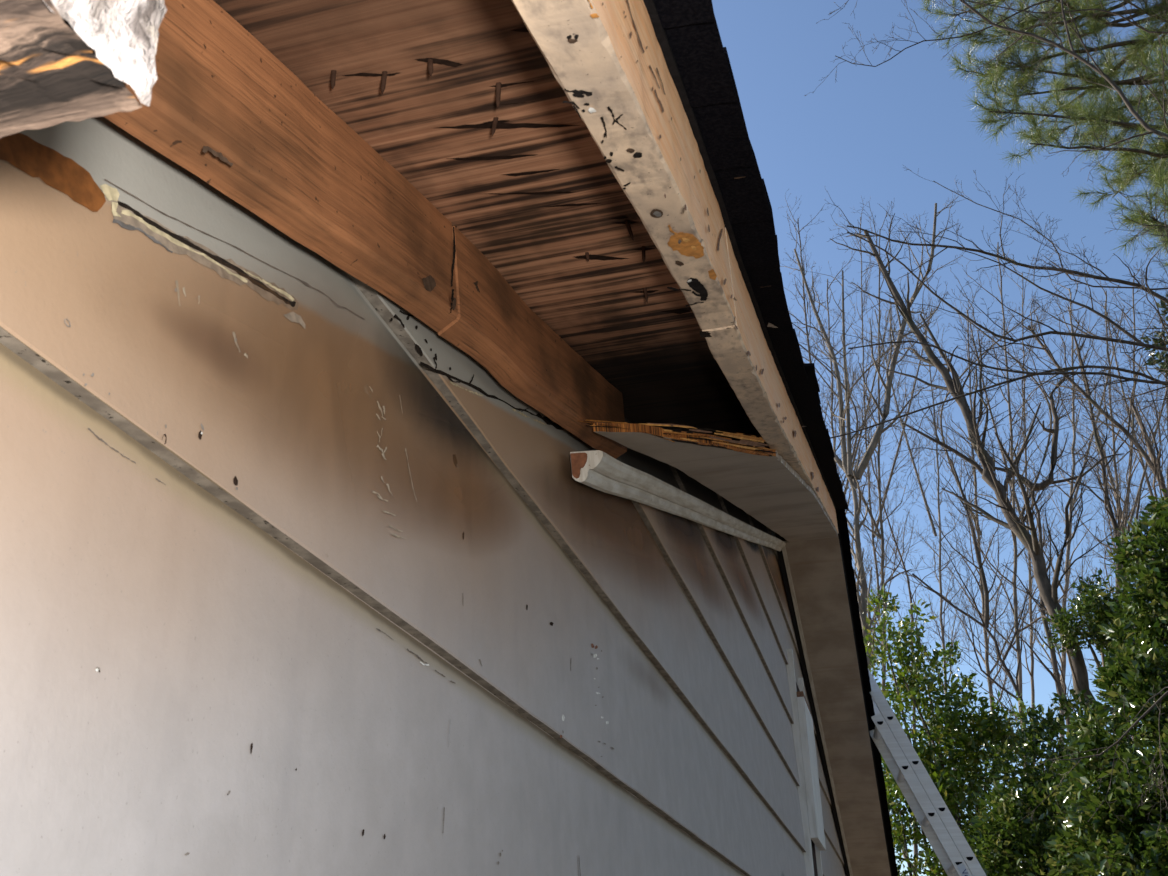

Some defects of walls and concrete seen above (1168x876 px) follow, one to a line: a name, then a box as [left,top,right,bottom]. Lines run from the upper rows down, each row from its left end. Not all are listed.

peeling [0,133,121,217]
crack [449,226,457,313]
water stain [390,310,437,361]
water stain [269,335,387,460]